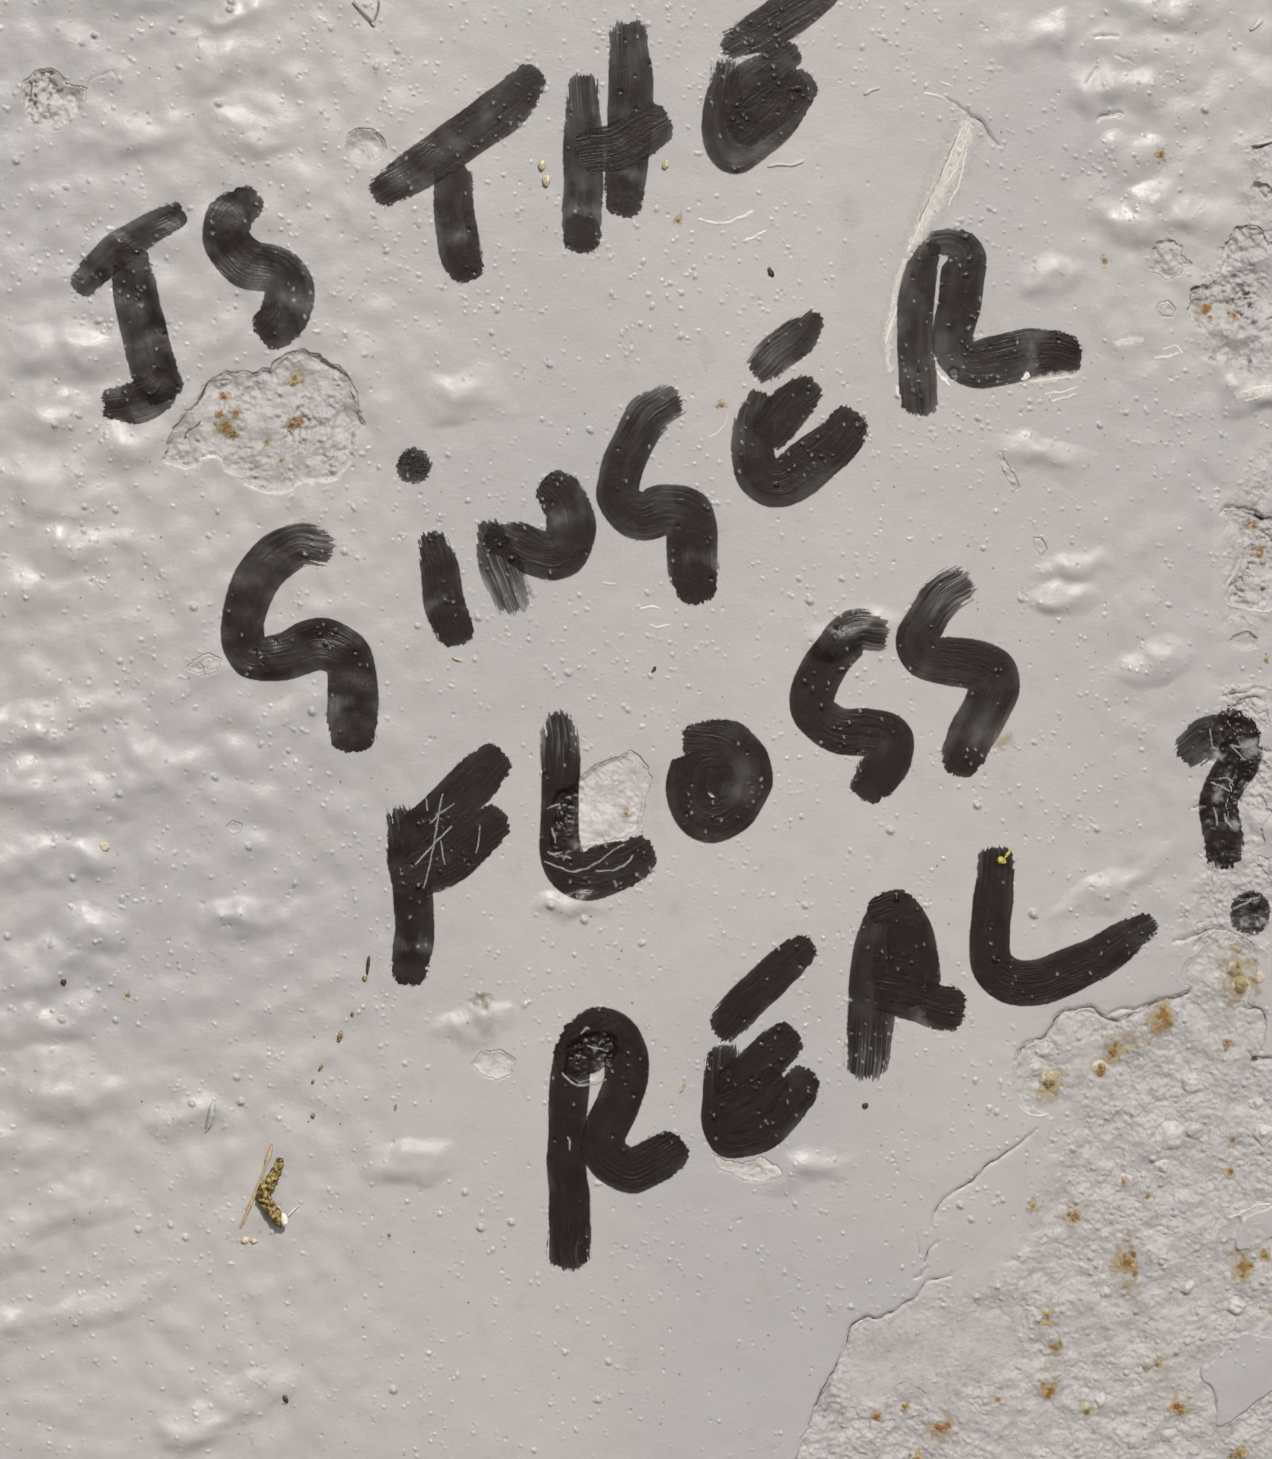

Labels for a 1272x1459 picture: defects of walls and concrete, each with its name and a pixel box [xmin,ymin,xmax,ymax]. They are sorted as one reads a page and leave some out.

spalling [21,68,87,131]
spalling [1151,124,1272,388]
spalling [162,349,365,492]
spalling [1209,407,1272,651]
spalling [558,750,652,849]
spalling [796,674,1272,1459]